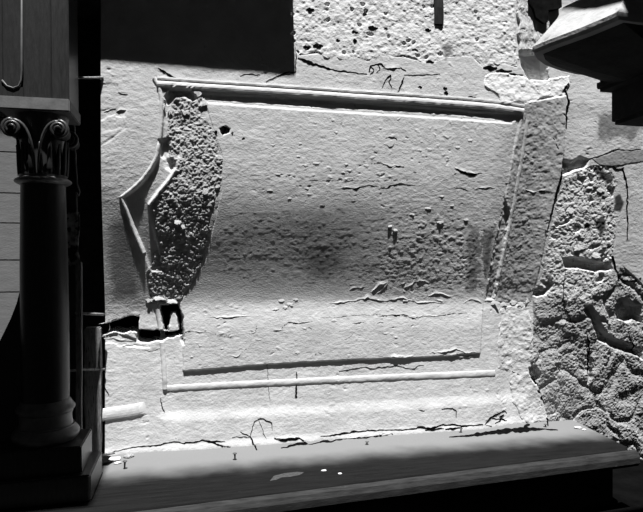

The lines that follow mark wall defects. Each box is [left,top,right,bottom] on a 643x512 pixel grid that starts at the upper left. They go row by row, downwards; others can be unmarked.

crack [241,46,437,92]
flaking render [289,0,570,104]
flaking render [99,81,223,351]
crack [526,83,570,235]
crack [590,149,640,240]
flaking render [490,149,643,423]
crack [339,364,424,372]
crack [111,408,507,453]